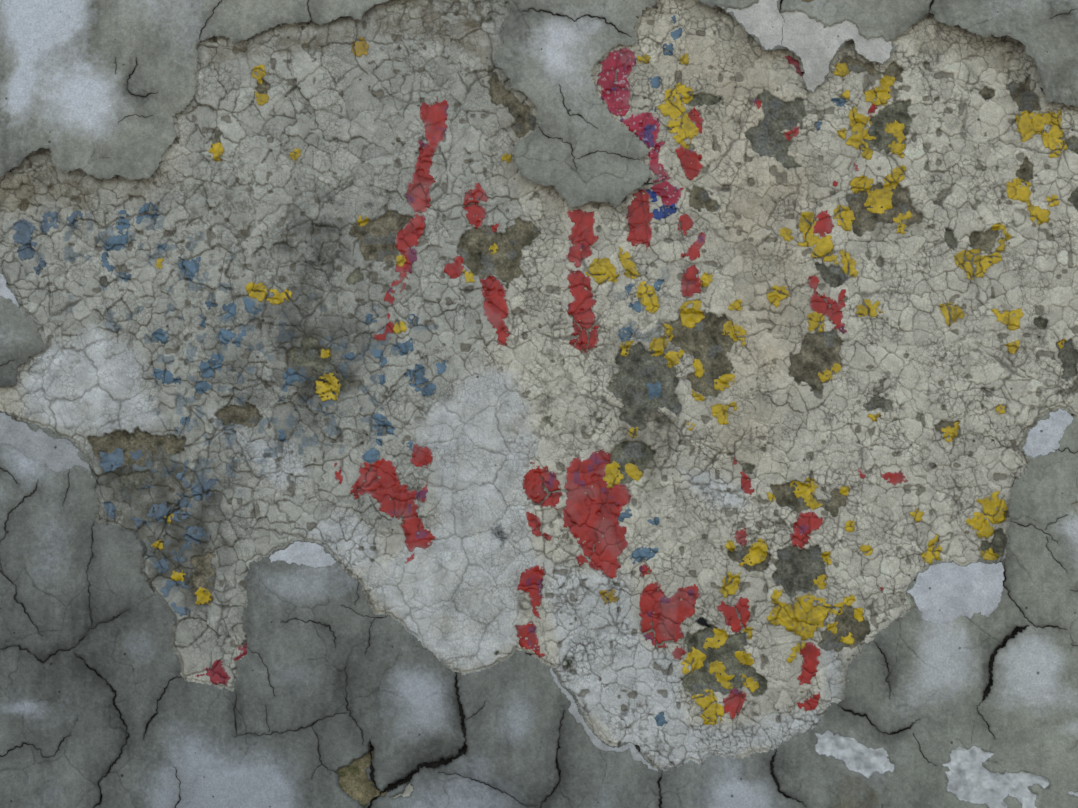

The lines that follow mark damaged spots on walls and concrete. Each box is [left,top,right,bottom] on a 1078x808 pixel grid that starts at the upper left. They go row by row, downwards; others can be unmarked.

crack [521,8,631,37]
peeling [649,195,664,213]
peeling [864,189,893,214]
peeling [603,461,624,488]
crack [0,468,182,808]
crack [233,575,565,808]
peeling [708,660,735,689]
crack [977,563,1078,738]
crack [770,750,806,806]
peeling [815,730,895,779]
crack [840,706,936,766]
peeling [942,746,1050,808]